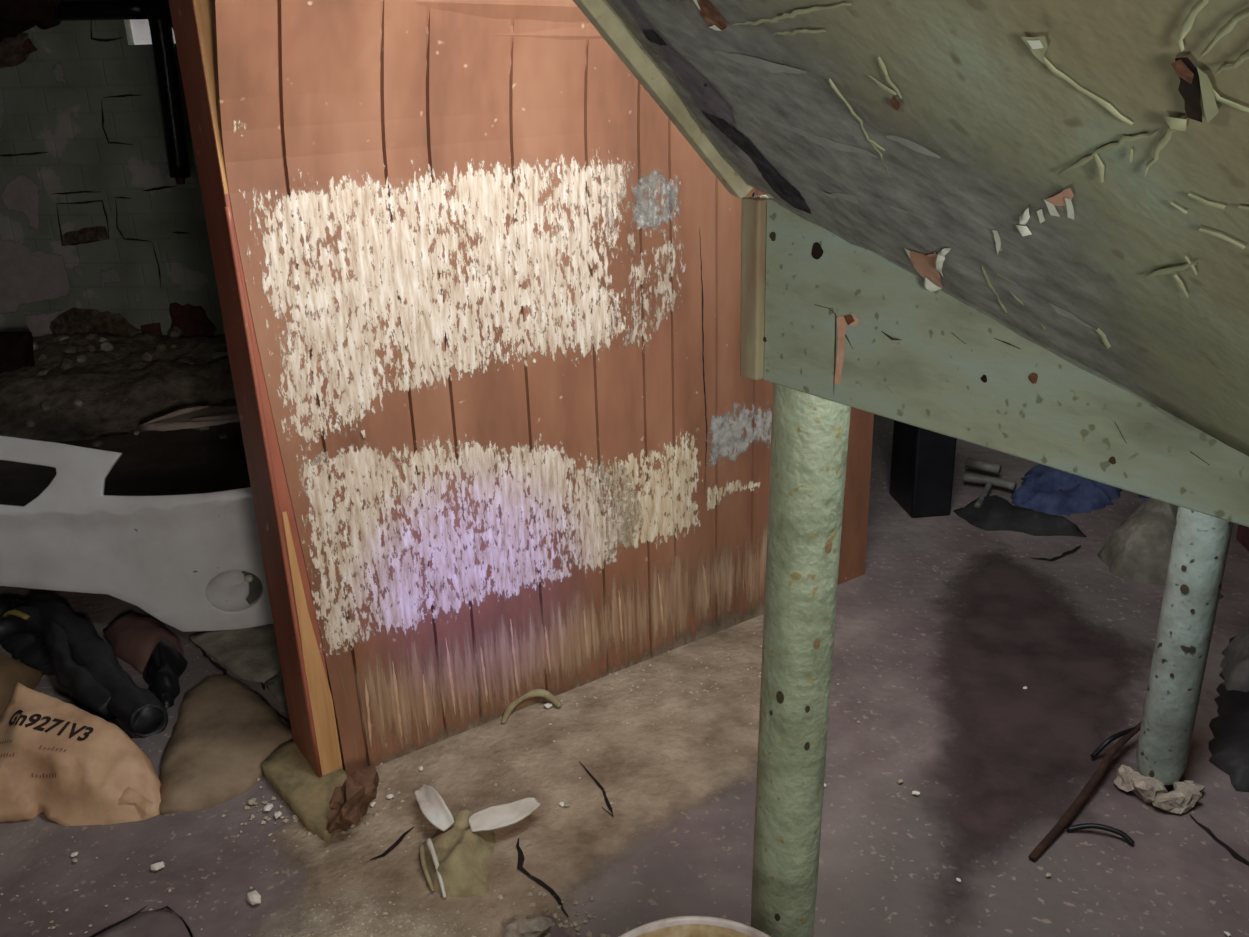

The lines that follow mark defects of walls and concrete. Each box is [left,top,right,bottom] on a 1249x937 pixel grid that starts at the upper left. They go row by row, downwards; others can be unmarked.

spalling [693,0,729,31]
crack [1177,0,1249,113]
crack [1043,57,1188,184]
spalling [62,226,109,245]
water stain [608,0,1136,394]
spalling [904,248,951,292]
spalling [1016,188,1074,236]
crack [1143,193,1249,299]
spalling [24,302,217,338]
peeling [239,148,772,752]
crack [516,838,569,917]
crack [90,906,193,937]